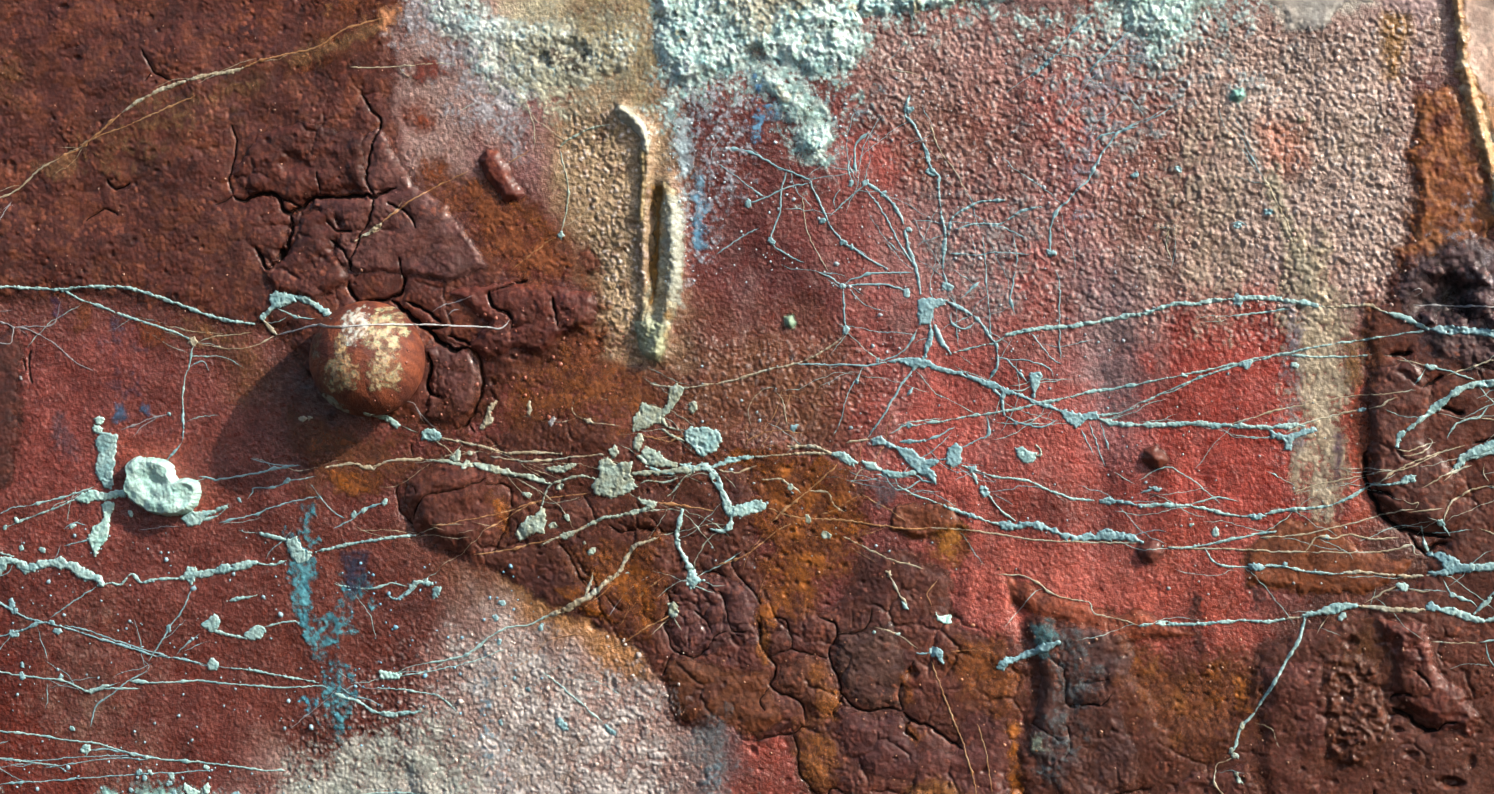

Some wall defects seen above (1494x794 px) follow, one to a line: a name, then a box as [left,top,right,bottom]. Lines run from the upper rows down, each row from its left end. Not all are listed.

crack [215,91,485,433]
water stain [383,0,1355,522]
crack [395,444,517,552]
crack [558,540,623,612]
corrosion [547,427,870,665]
corrosion [938,526,968,568]
water stain [136,780,183,794]
water stain [276,551,737,794]
crack [662,551,963,794]
corrosion [799,664,841,787]
corrosion [908,779,955,794]
corrosion [947,633,1024,794]